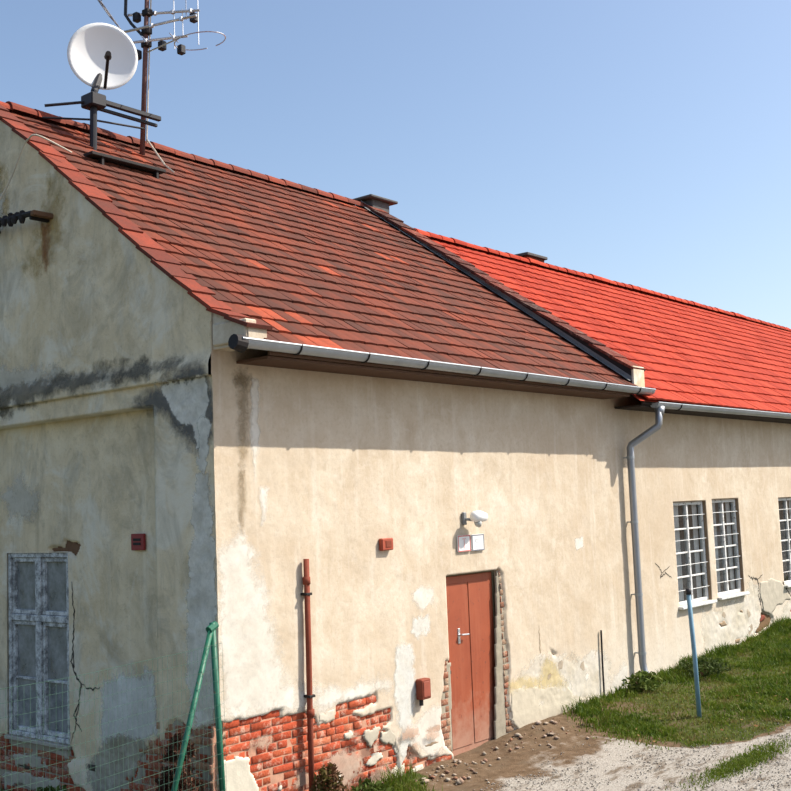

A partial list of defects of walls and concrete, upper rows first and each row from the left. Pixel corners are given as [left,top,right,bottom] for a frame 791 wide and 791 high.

damp [0,357,213,449]
damp [234,373,260,464]
crack [70,589,100,741]
flaking render [0,375,453,791]
damp [218,535,416,768]
peeling [702,580,771,655]
peeling [782,601,791,622]